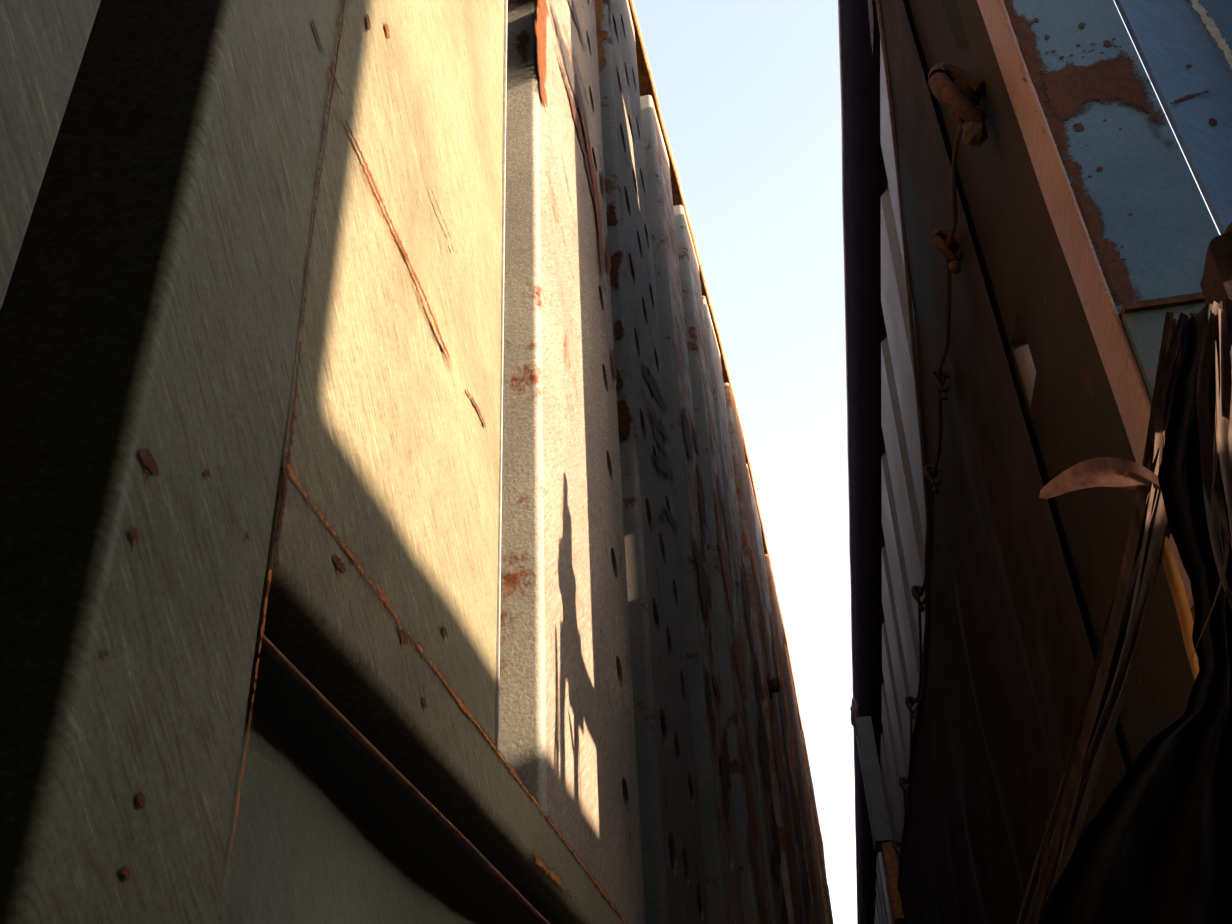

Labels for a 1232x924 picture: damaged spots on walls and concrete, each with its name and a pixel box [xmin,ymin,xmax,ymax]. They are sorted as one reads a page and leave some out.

rust [516,0,549,106]
rust [996,0,1165,305]
rust [612,320,633,440]
rust [228,261,628,924]